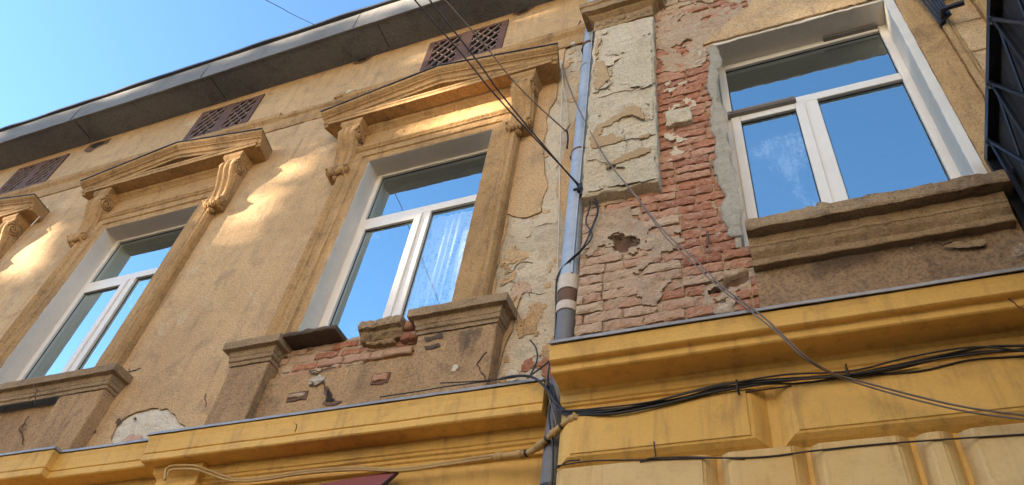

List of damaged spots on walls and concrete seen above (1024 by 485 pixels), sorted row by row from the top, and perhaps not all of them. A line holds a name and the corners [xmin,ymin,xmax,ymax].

flaking render [495,0,760,384]
flaking render [278,337,417,385]
flaking render [286,391,309,403]
spalling [322,386,342,406]
spalling [112,409,185,444]